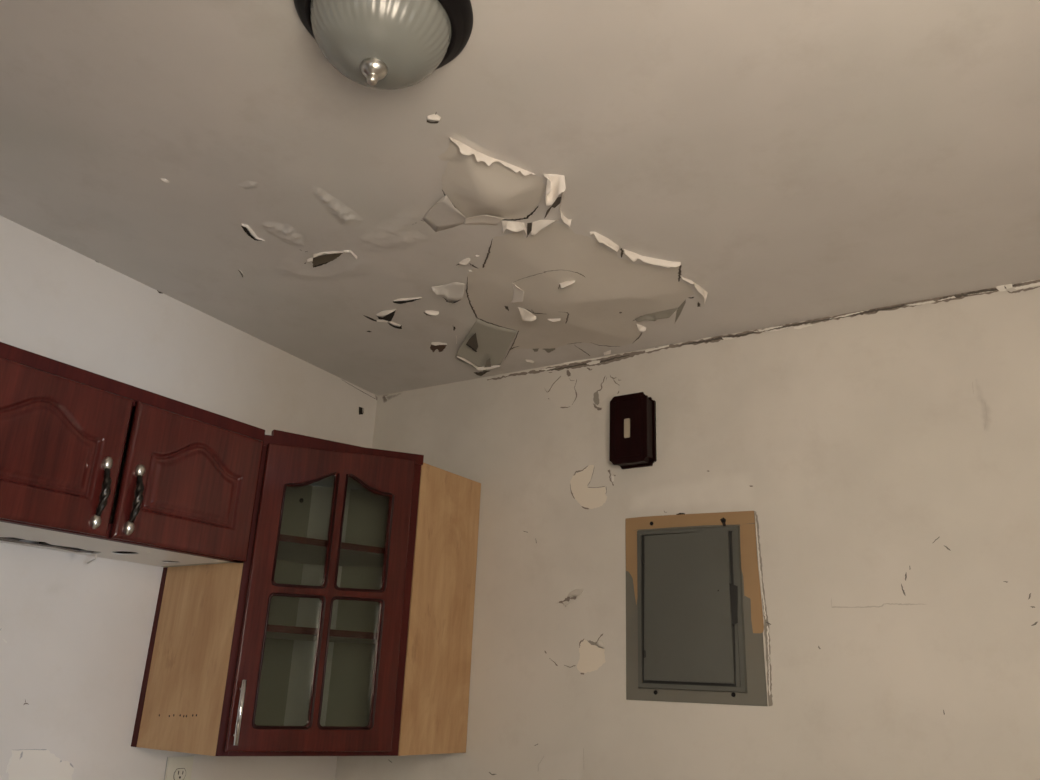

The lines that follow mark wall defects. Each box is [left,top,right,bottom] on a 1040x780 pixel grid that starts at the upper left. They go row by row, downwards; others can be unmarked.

peeling [241,224,265,241]
peeling [301,250,357,268]
peeling [364,137,708,363]
crack [487,280,1040,381]
peeling [570,465,616,509]
peeling [545,634,606,675]